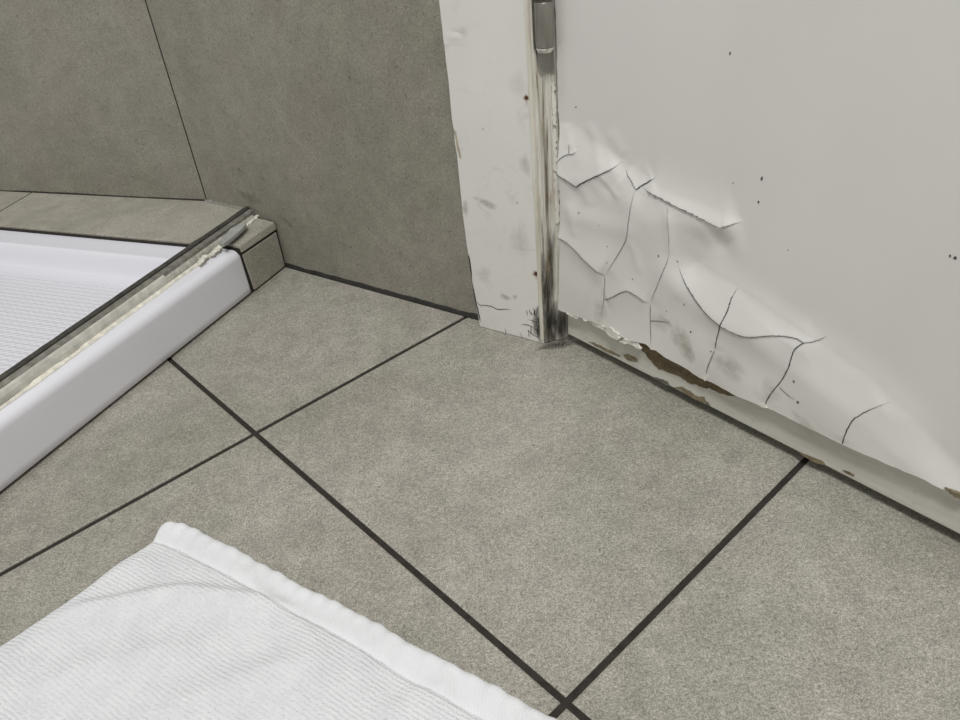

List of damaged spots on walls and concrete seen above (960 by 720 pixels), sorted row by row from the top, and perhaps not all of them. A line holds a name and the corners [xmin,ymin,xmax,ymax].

water stain [542,240,566,347]
crack [557,144,825,404]
peeling [551,82,899,445]
crack [842,404,884,444]